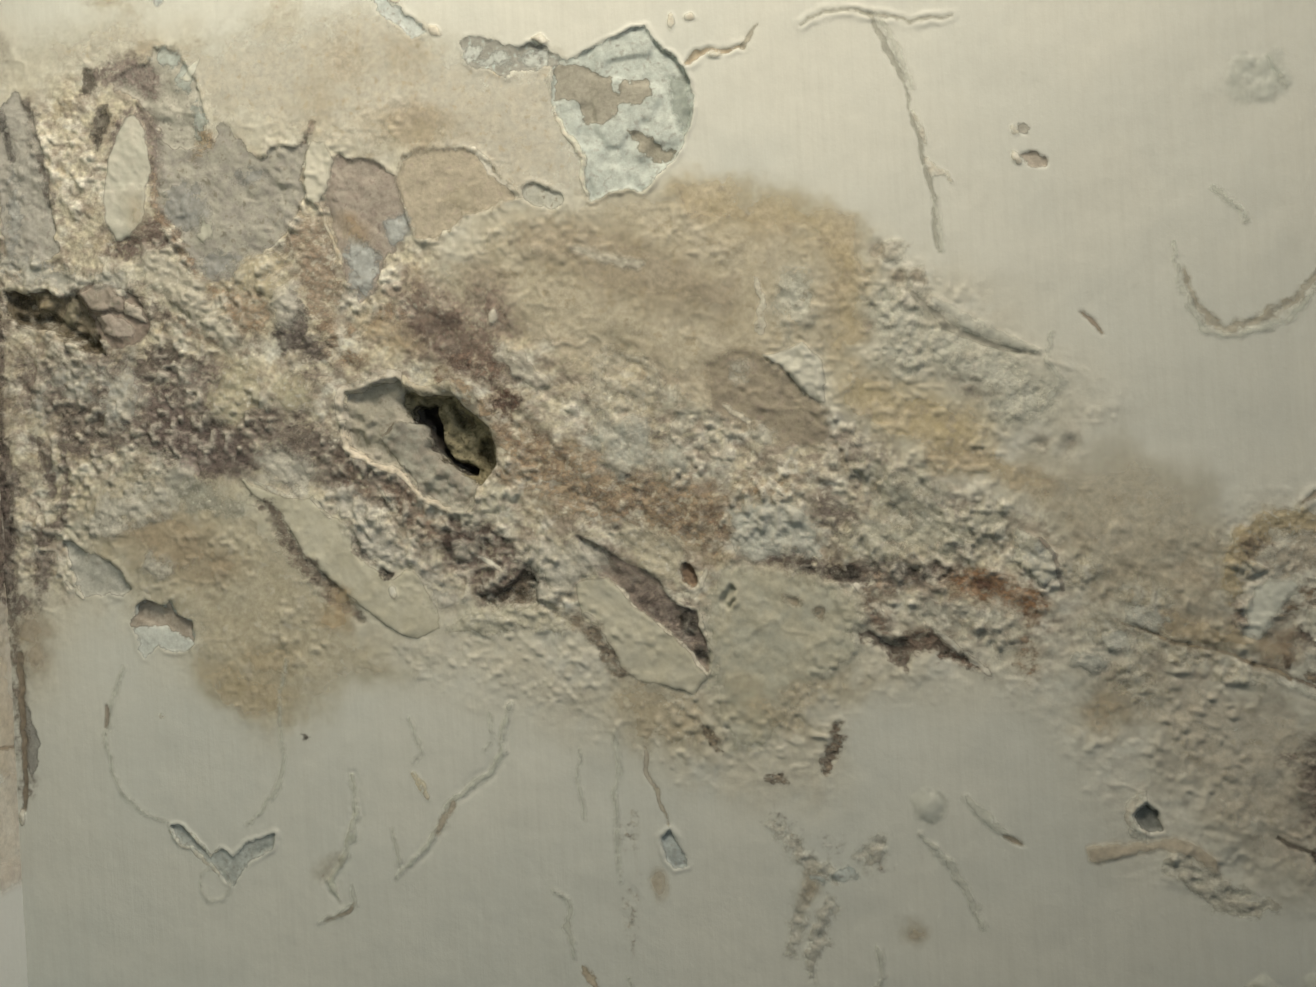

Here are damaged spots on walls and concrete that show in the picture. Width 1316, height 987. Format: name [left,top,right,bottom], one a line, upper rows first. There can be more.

spalling [0,92,150,354]
leakage [82,31,161,185]
spalling [103,45,564,303]
peeling [460,25,694,201]
leakage [398,182,1054,489]
crack [808,9,952,247]
crack [1180,271,1316,337]
crack [0,620,44,825]
leakage [0,253,683,879]
hole [334,369,496,514]
leakage [730,430,1002,618]
crack [1146,630,1316,696]